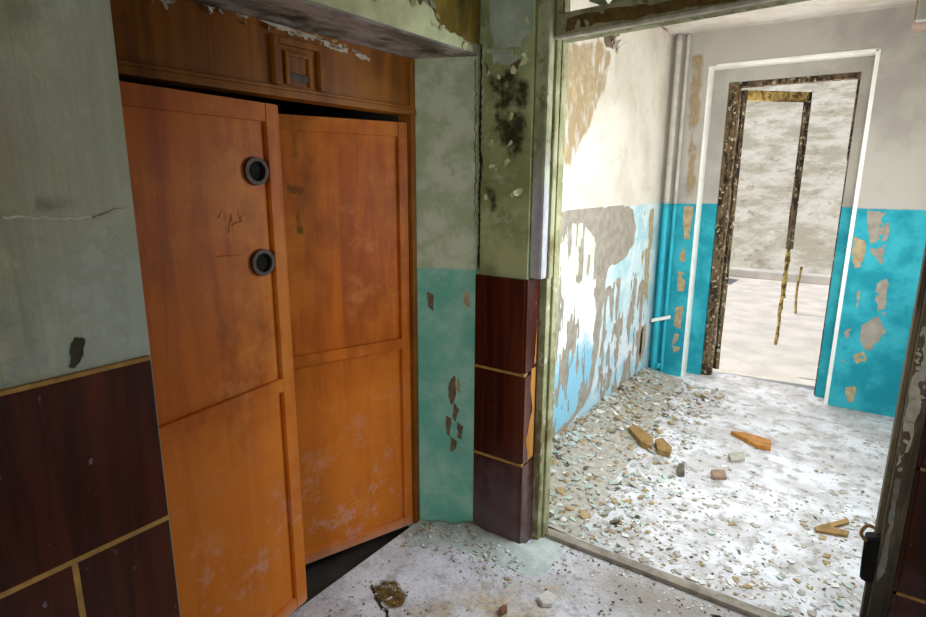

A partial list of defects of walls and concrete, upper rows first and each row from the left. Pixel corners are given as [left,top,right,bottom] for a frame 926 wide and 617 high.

peeling [261,20,370,62]
peeling [311,0,533,79]
peeling [565,0,737,31]
damp [491,71,528,154]
peeling [564,34,627,164]
crack [3,208,124,221]
peeling [677,206,693,292]
peeling [852,210,890,268]
peeling [552,205,654,438]
peeling [672,306,684,352]
peeling [842,279,889,364]
peeling [445,376,463,452]